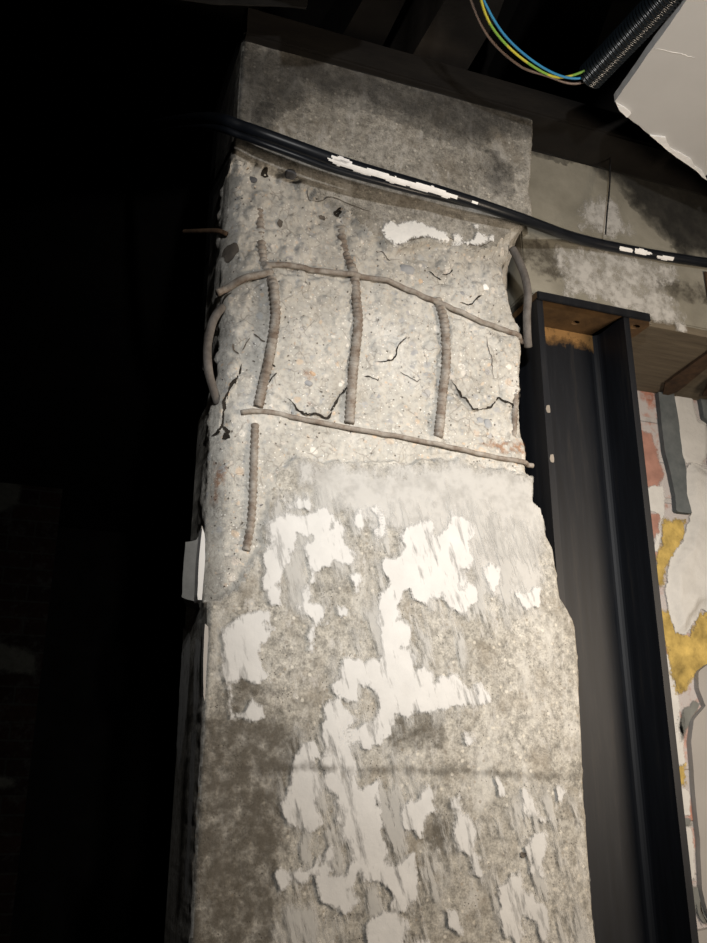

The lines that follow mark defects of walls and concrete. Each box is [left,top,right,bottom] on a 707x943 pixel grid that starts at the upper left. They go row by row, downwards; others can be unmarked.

peeling [616,102,631,117]
peeling [650,134,707,180]
damp [517,241,565,277]
crack [199,293,277,446]
crack [289,337,420,419]
crack [451,336,521,410]
flaking render [642,431,665,552]
spalling [176,160,594,943]
peeling [667,655,685,766]
peeling [682,788,695,879]